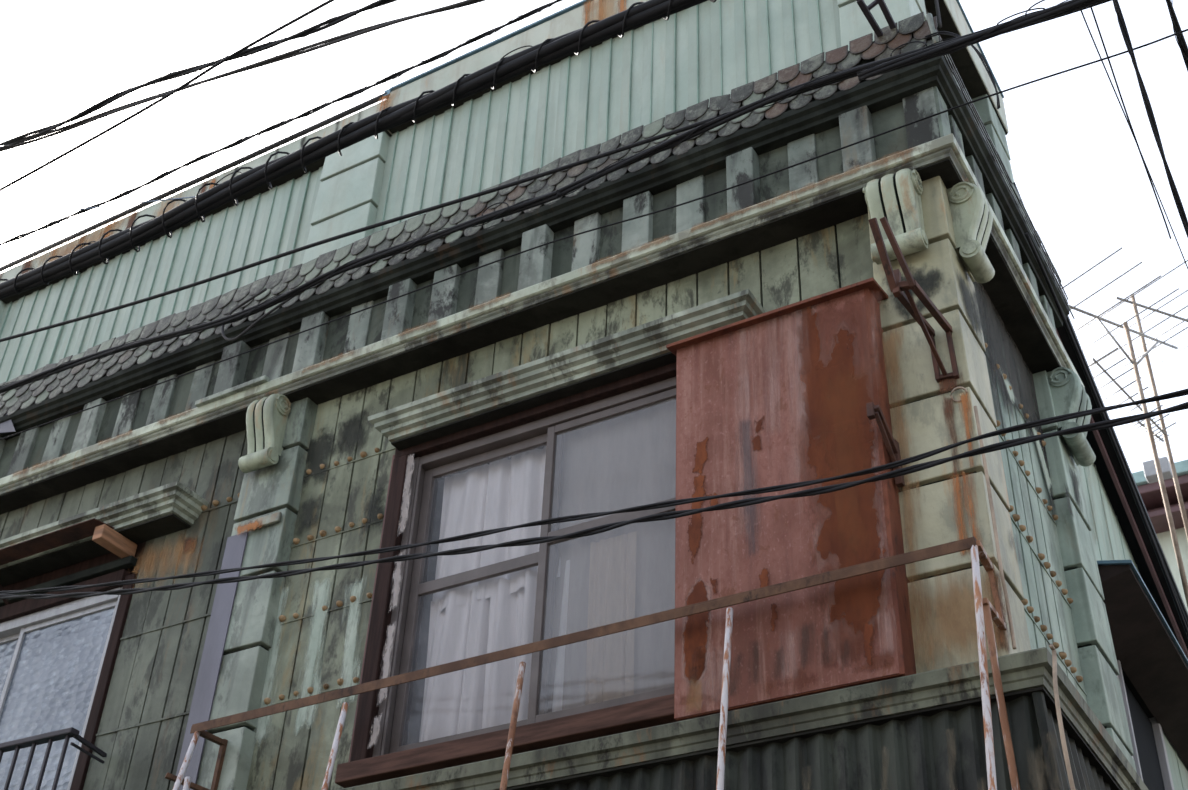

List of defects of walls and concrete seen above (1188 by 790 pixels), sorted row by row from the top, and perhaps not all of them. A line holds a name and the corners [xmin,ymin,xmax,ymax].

damp [883,267,940,315]
damp [959,275,983,339]
corrosion [687,437,718,564]
corrosion [751,415,765,451]
corrosion [939,378,978,554]
corrosion [683,578,718,684]